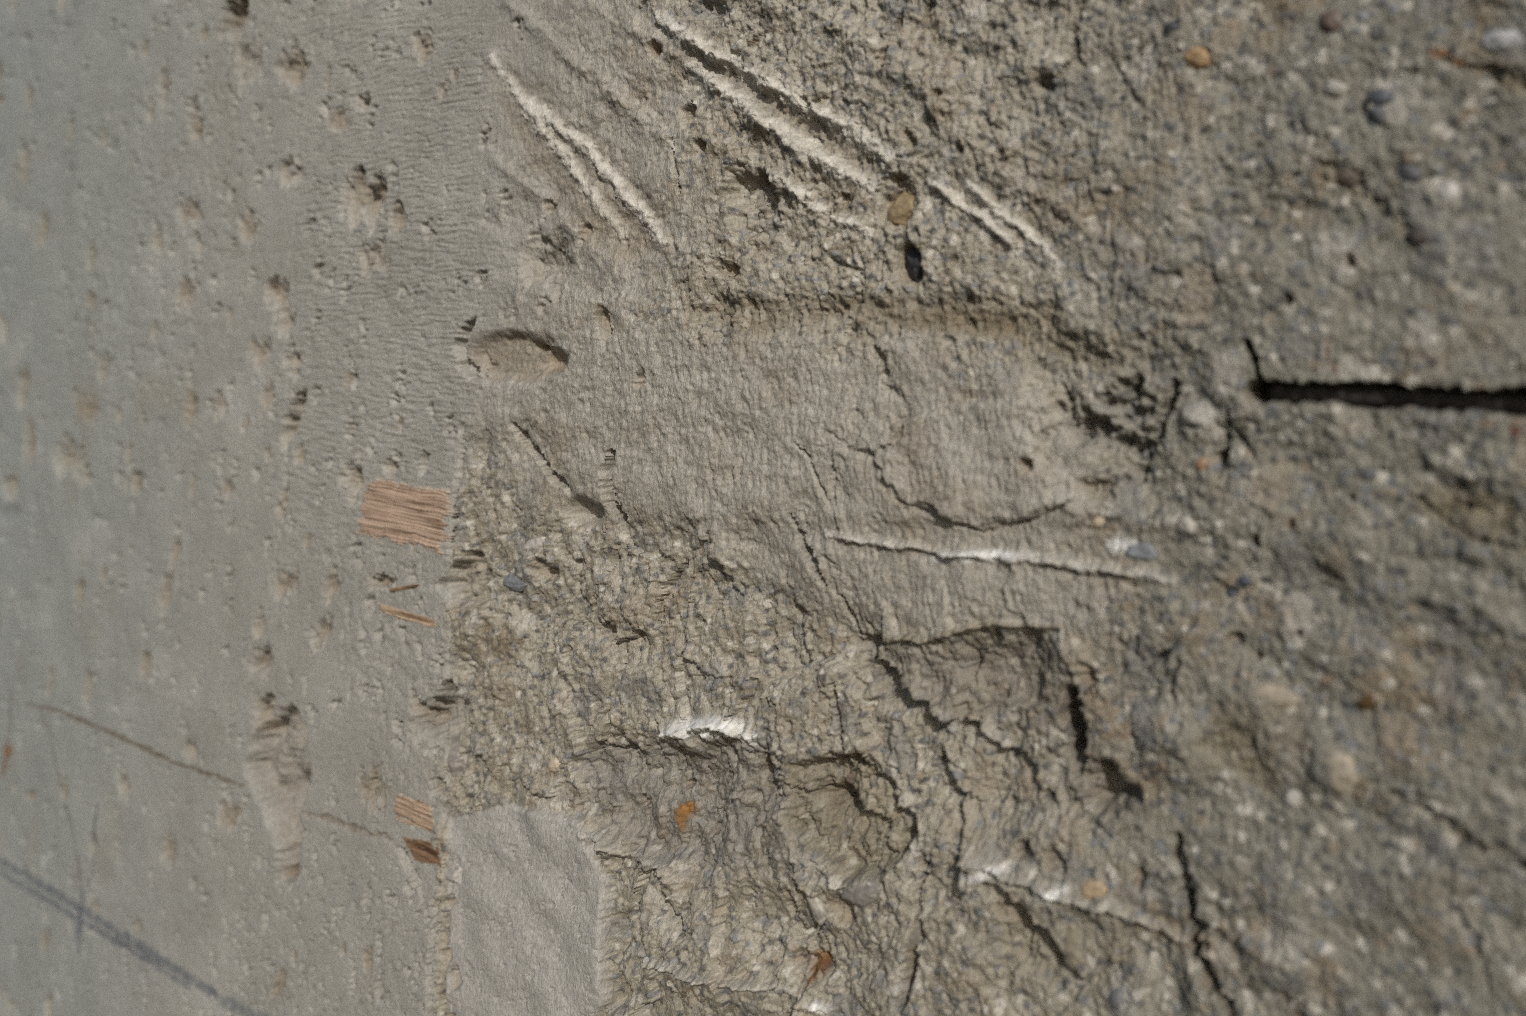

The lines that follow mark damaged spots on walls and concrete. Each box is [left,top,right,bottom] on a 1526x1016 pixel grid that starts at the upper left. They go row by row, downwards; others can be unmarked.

spalling [679,100,806,244]
spalling [507,197,595,305]
spalling [452,316,570,388]
spalling [683,126,1183,529]
spalling [435,548,499,614]
spalling [523,537,561,586]
spalling [559,493,608,531]
spalling [407,675,470,801]
spalling [850,632,1145,827]
spalling [1192,696,1298,800]
spalling [579,716,922,1016]
spalling [977,836,1082,1001]